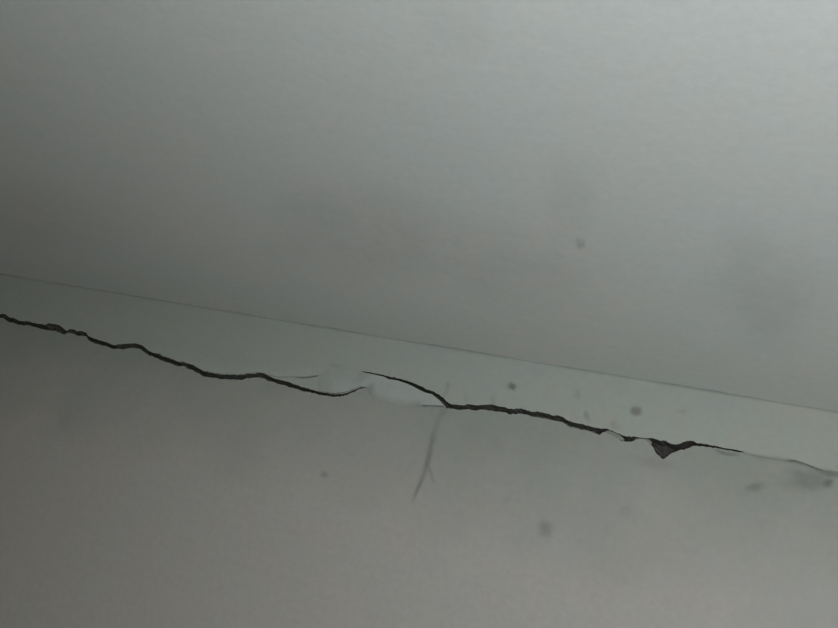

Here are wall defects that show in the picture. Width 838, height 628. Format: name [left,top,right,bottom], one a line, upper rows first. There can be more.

crack [0,314,652,444]
crack [680,441,743,452]
crack [787,460,823,471]